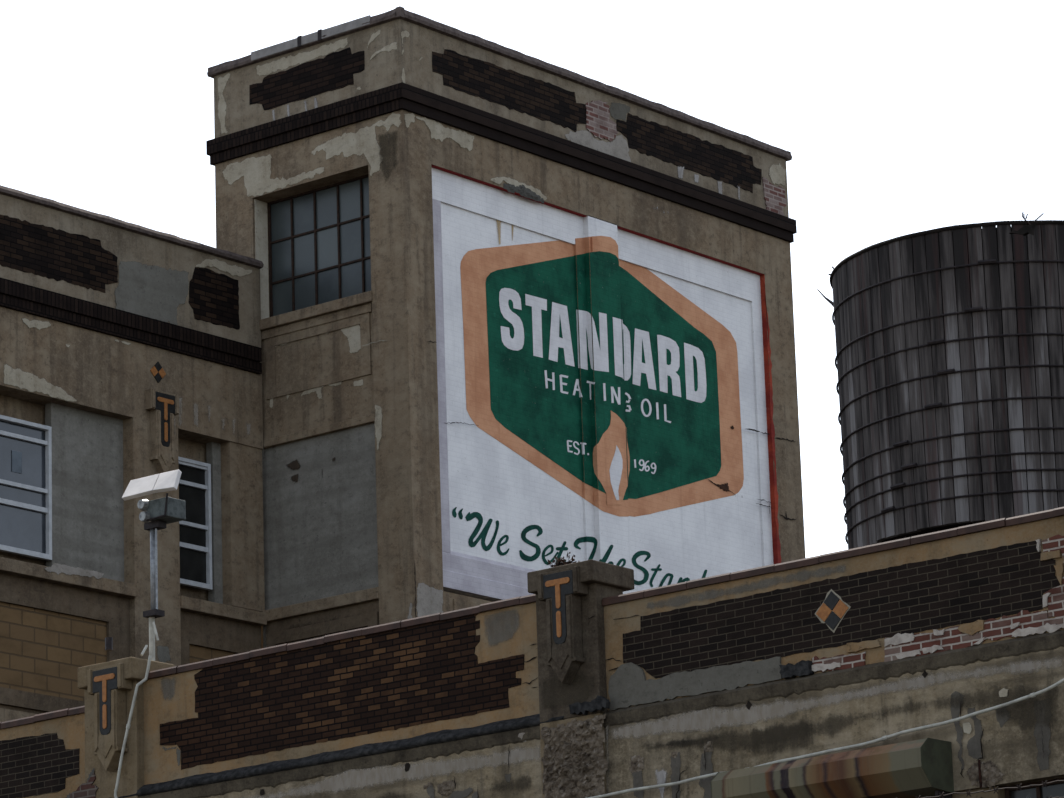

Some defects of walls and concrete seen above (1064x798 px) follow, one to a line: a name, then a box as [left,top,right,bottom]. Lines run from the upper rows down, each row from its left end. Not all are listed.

flaking render [585,100,618,142]
flaking render [762,163,787,216]
flaking render [811,534,1064,673]